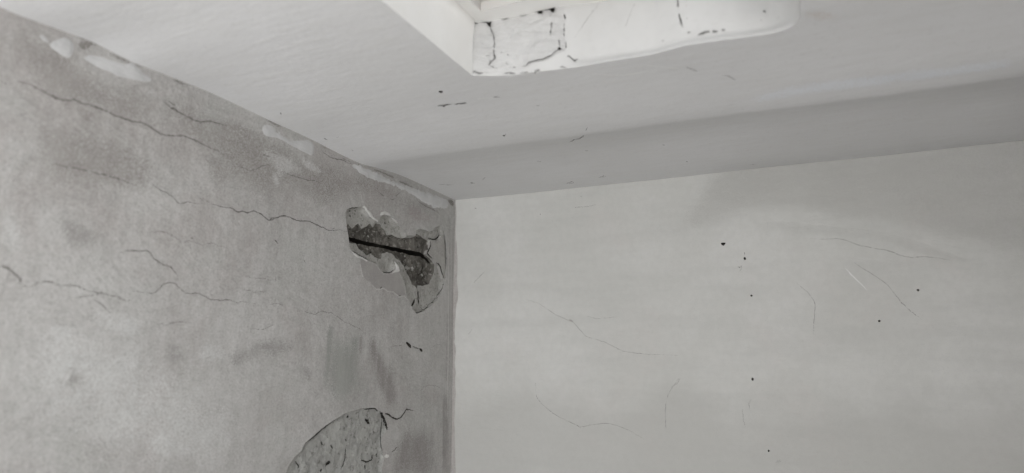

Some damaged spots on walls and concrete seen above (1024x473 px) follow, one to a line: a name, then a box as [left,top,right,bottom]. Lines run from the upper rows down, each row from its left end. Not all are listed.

crack [0,80,319,183]
crack [55,163,346,232]
crack [1,231,278,330]
flaking render [345,206,446,314]
flaking render [286,408,414,473]